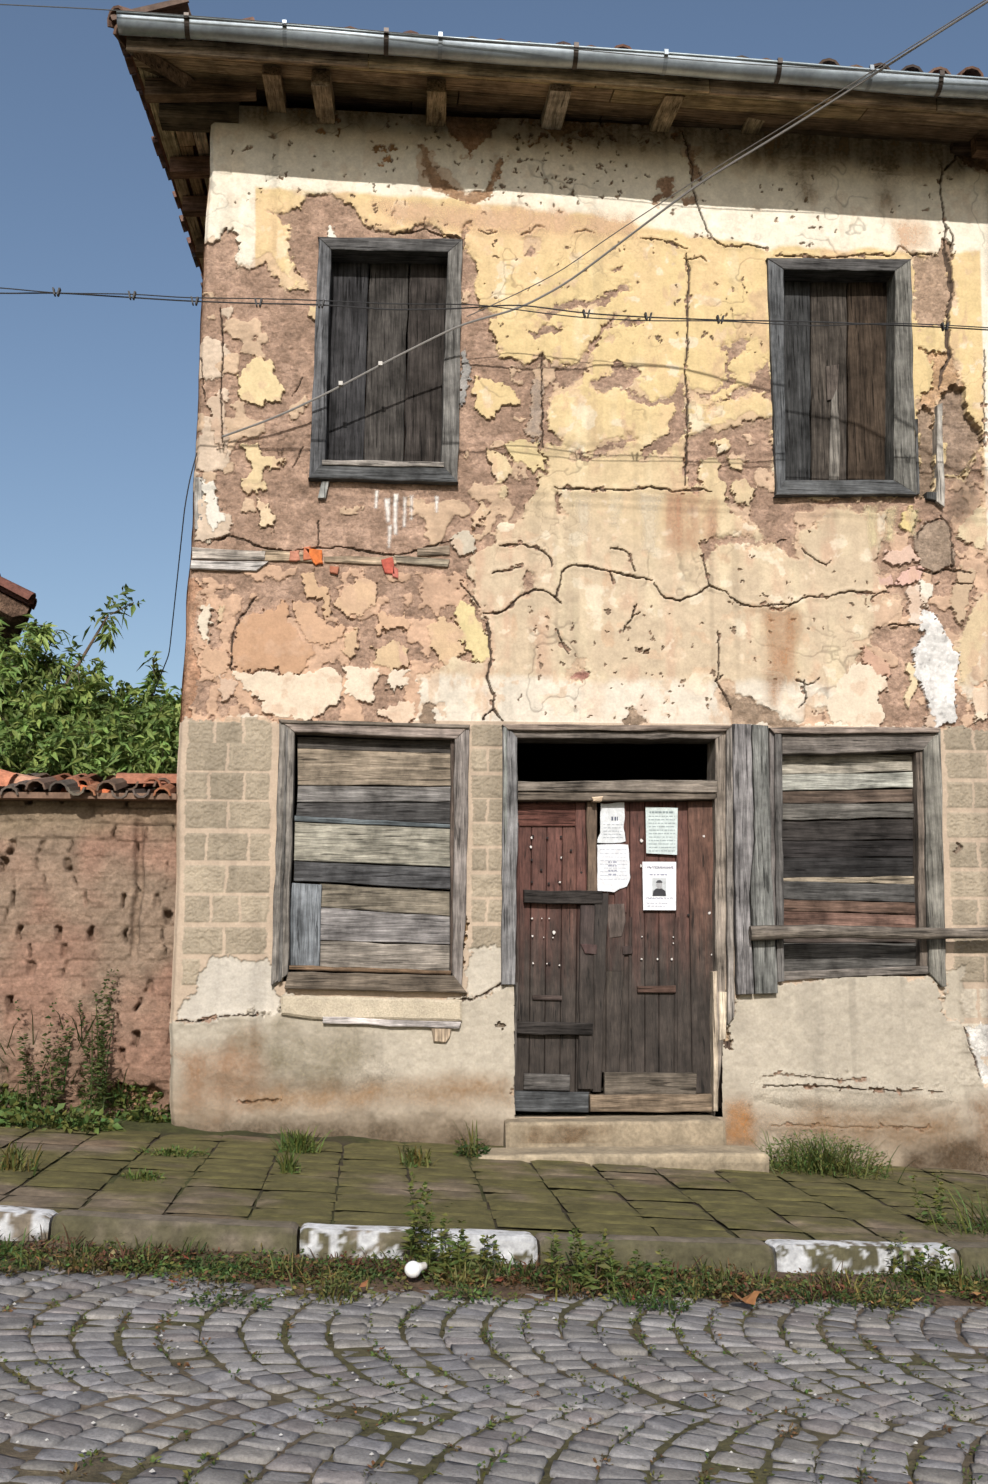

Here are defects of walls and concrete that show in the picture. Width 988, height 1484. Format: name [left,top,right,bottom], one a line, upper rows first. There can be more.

crack [554,130,988,495]
crack [539,352,547,450]
flaking render [181,114,988,731]
crack [208,520,454,556]
crack [230,595,259,668]
crack [460,514,974,721]
flaking render [966,1021,988,1083]